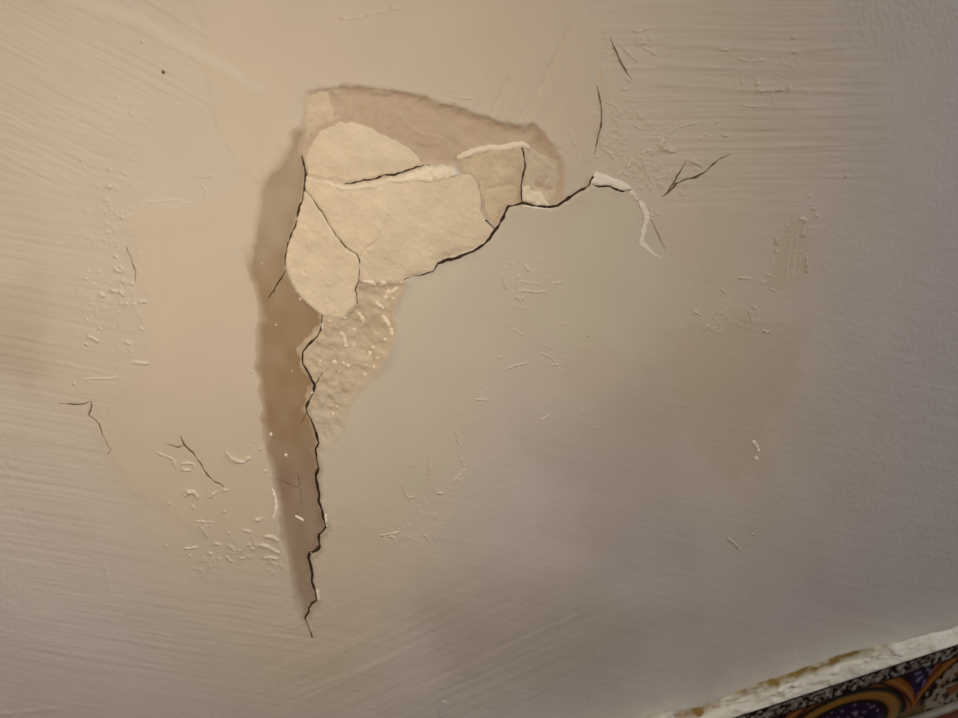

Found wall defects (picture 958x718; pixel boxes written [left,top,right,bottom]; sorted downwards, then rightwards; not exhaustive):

spalling [268,82,567,451]
crack [270,315,328,638]